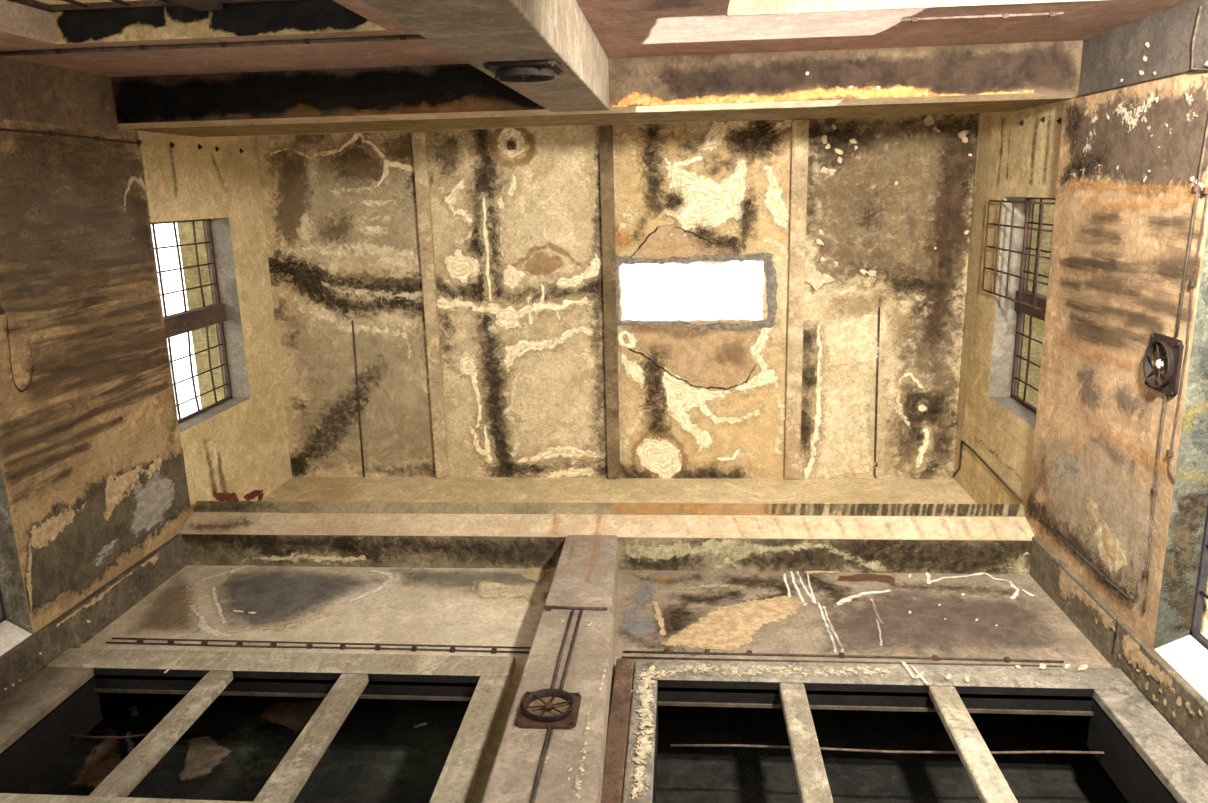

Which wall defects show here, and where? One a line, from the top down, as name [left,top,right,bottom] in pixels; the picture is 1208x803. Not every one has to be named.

damp [1030,119,1050,183]
damp [1156,216,1204,236]
damp [269,119,794,479]
damp [804,114,1010,479]
damp [1061,257,1191,347]
damp [1160,259,1208,304]
damp [0,248,169,483]
damp [1078,364,1150,415]
damp [208,455,226,494]
flaking render [25,449,191,628]
damp [765,437,1208,633]
damp [185,553,394,661]